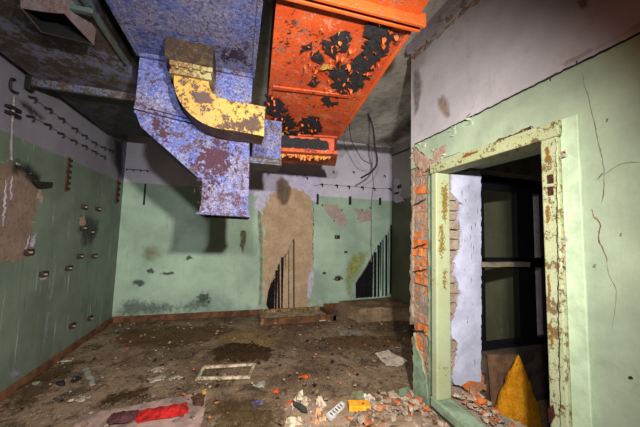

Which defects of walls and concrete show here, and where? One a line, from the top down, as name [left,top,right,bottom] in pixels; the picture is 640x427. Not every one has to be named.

rust [214,40,253,69]
rust [145,110,171,146]
rust [191,91,213,103]
rust [214,113,264,132]
peeling [0,159,44,264]
rust [185,134,242,206]
peeling [259,186,314,309]
leakage [356,225,392,297]
spalling [394,141,447,407]
crack [414,32,640,327]